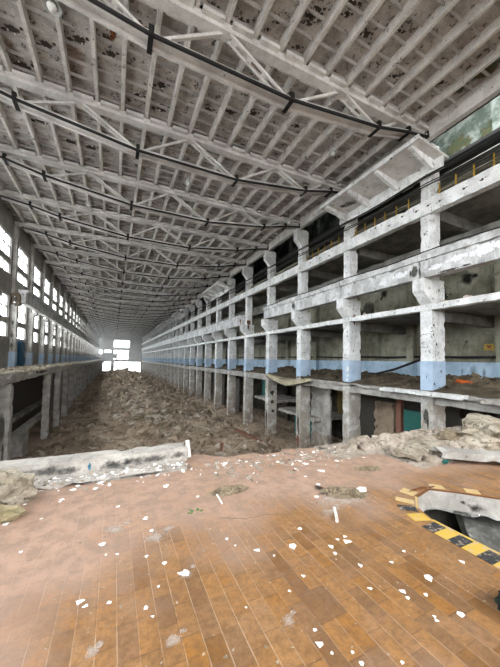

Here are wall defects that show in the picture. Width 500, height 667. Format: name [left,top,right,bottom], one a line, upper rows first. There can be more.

peeling [301,5,326,27]
peeling [67,33,90,45]